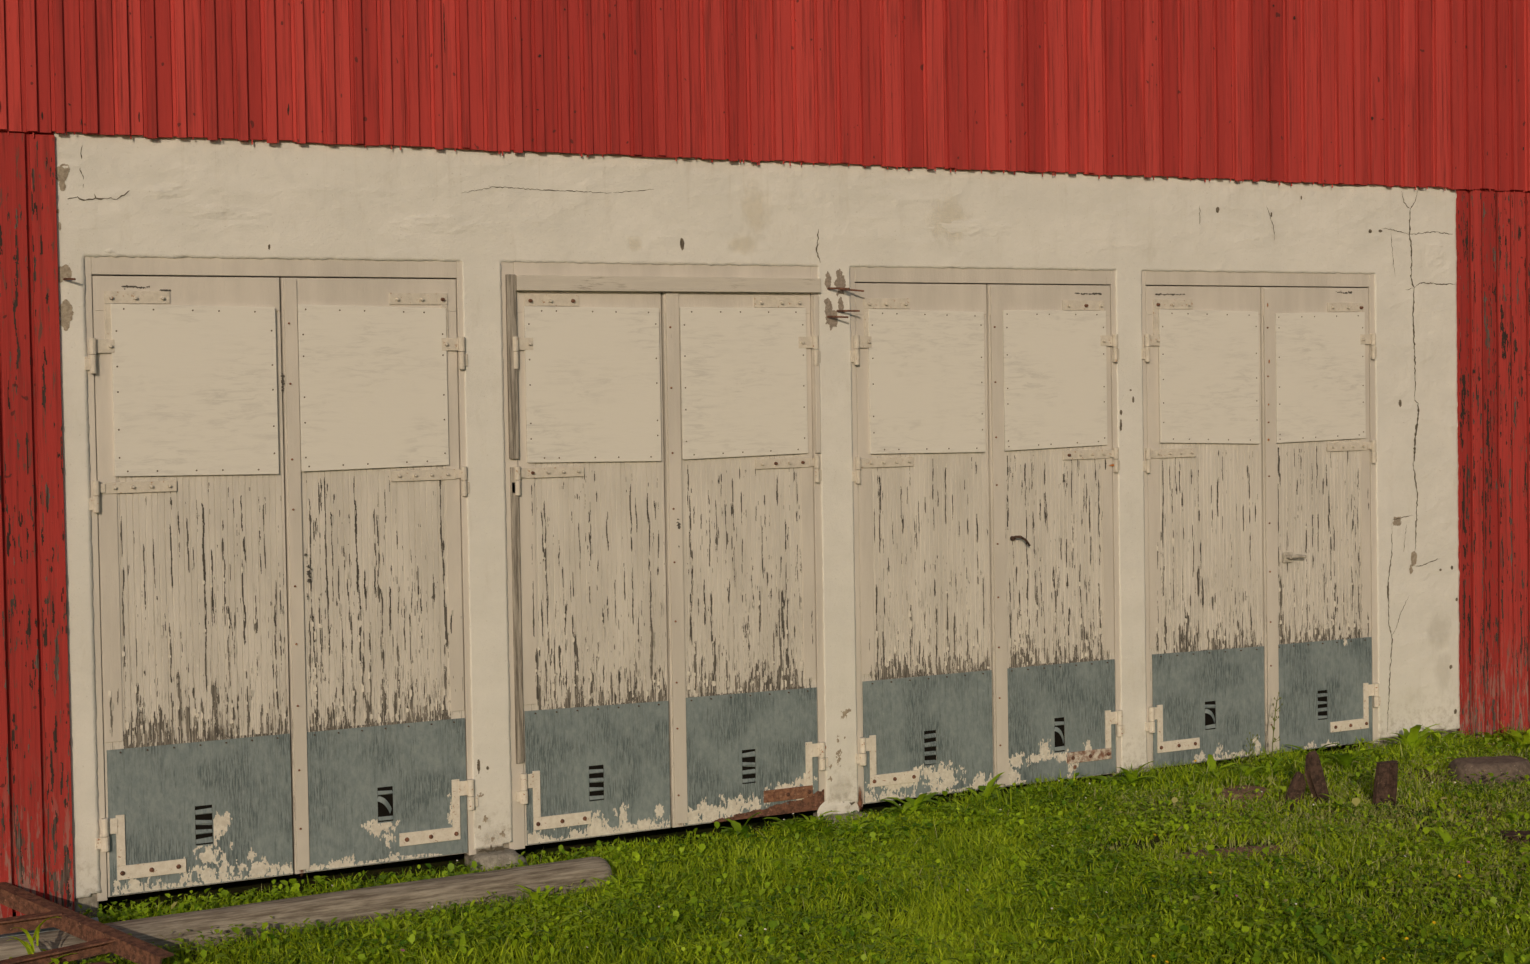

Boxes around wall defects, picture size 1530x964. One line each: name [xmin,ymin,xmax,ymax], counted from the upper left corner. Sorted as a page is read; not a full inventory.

peeling [0,141,74,907]
peeling [108,483,289,749]
peeling [304,476,463,732]
peeling [531,471,667,710]
peeling [677,467,813,698]
peeling [869,457,990,680]
peeling [1006,455,1109,668]
peeling [1156,446,1369,653]
crack [1383,191,1456,747]
peeling [112,811,442,896]
rust [712,789,824,823]
peeling [865,739,1092,803]